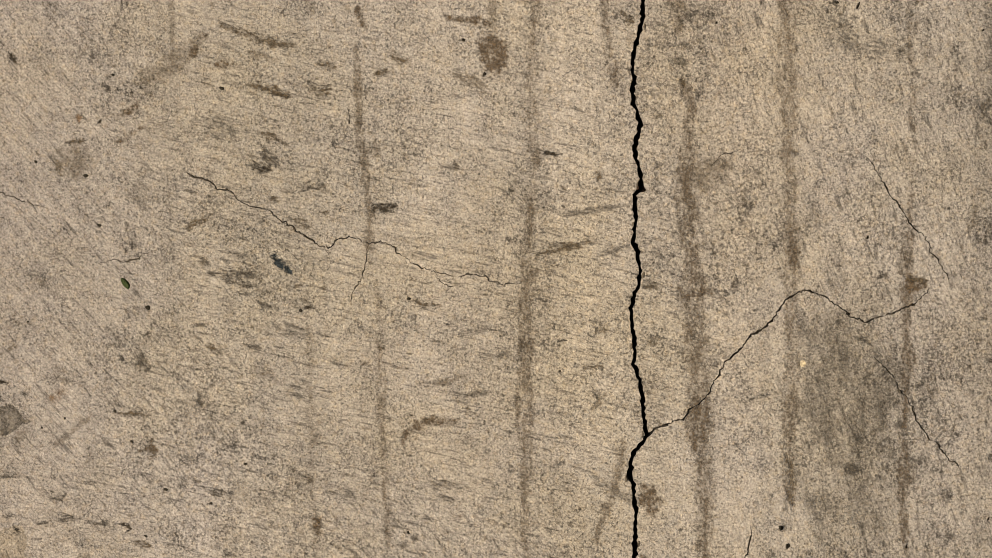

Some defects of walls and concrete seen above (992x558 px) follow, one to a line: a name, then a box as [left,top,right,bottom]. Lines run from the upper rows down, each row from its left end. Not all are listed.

crack [182,171,520,308]
crack [624,0,959,558]